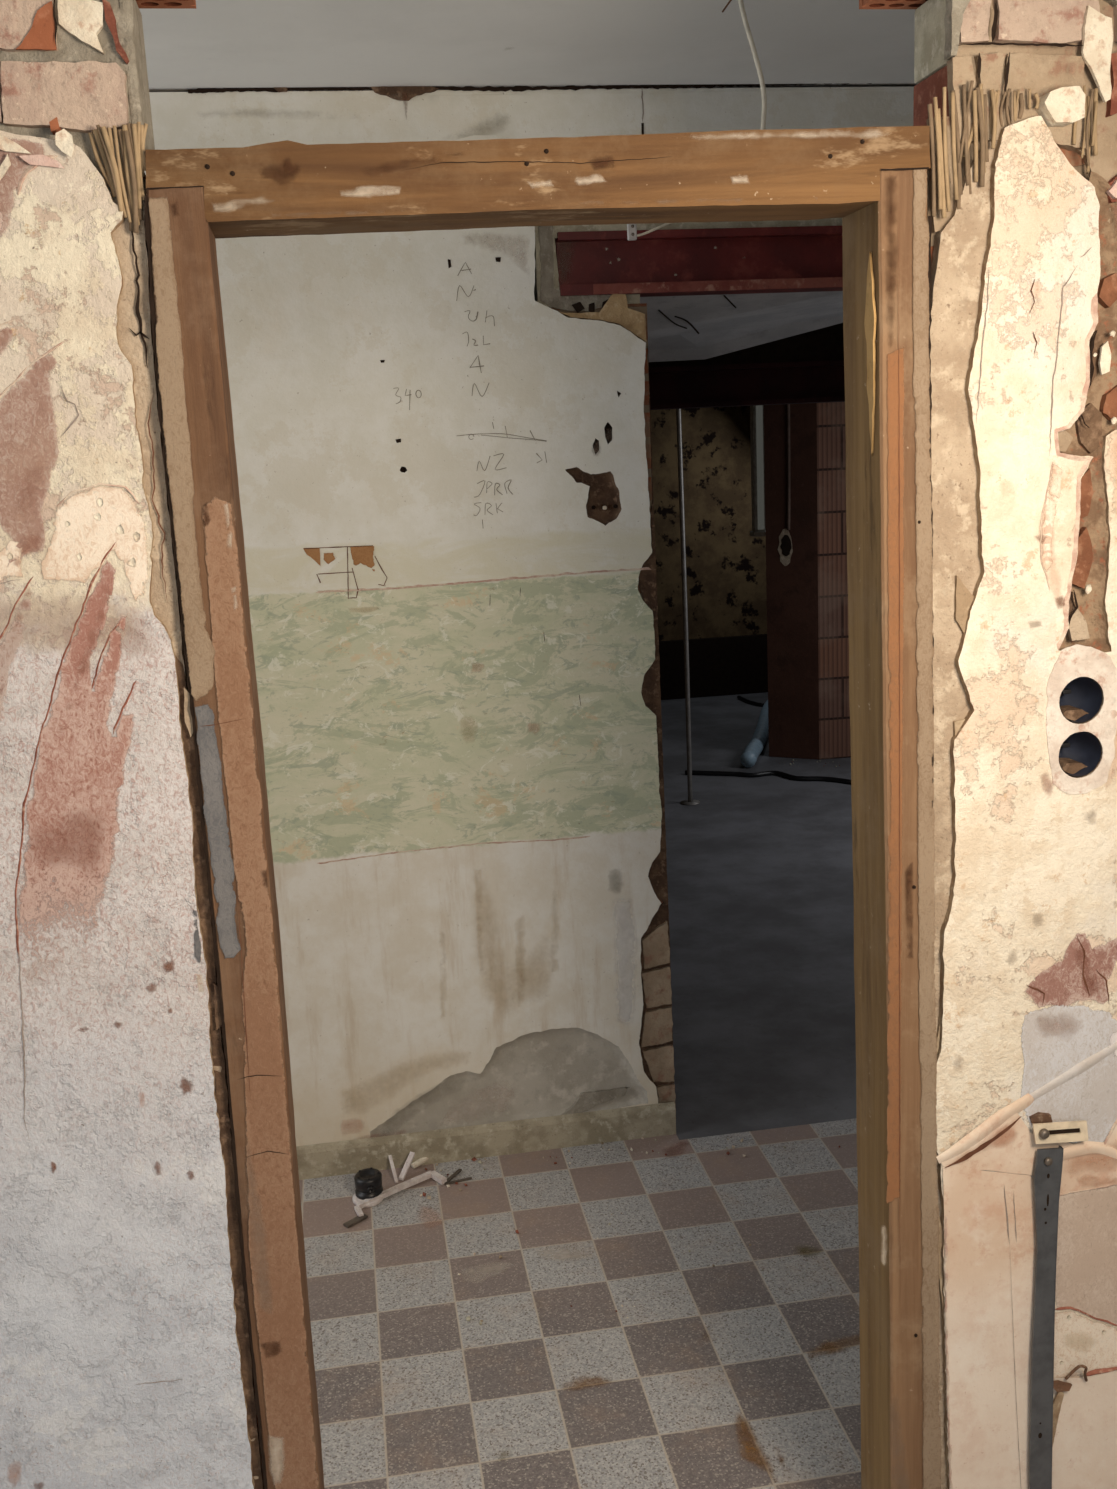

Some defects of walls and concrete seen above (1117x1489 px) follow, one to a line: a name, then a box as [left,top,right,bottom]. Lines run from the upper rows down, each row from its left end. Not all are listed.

peeling [0,0,318,1489]
flaking render [303,545,387,599]
flaking render [370,294,676,1138]
peeling [886,348,905,1204]
flaking render [936,1160,953,1489]
flaking render [913,0,1117,1052]
peeling [1020,933,1117,1143]
peeling [1054,1185,1117,1378]